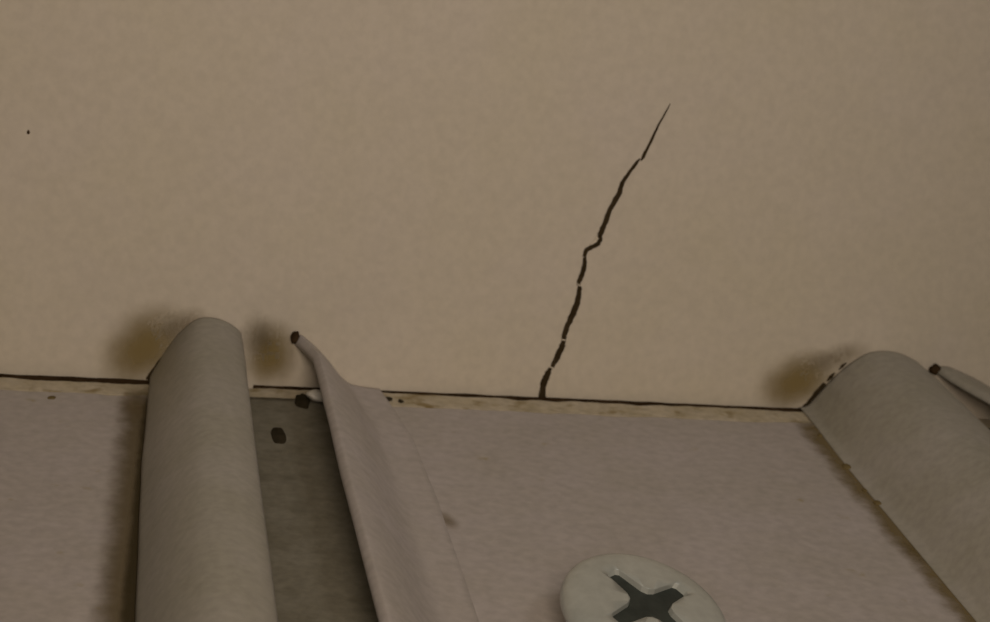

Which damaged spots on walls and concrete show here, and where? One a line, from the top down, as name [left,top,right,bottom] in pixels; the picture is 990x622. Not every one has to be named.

crack [538,104,670,398]
peeling [295,389,323,409]
spalling [271,427,286,444]